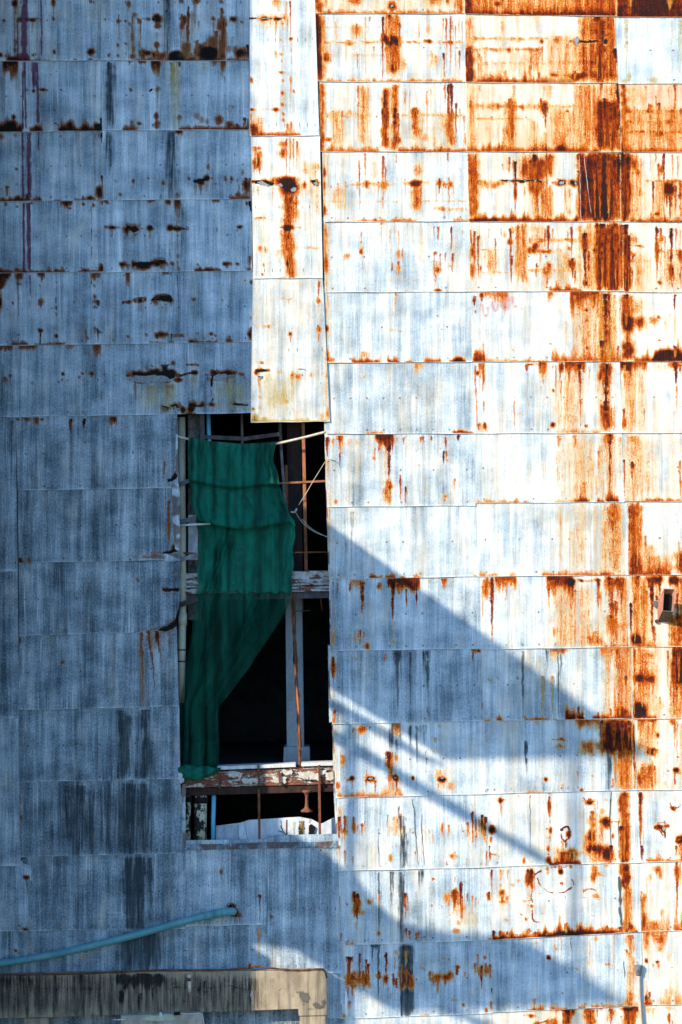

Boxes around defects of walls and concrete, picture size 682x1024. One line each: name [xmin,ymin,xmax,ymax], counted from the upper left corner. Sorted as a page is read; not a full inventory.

rust [0,0,301,284]
rust [217,0,682,1024]